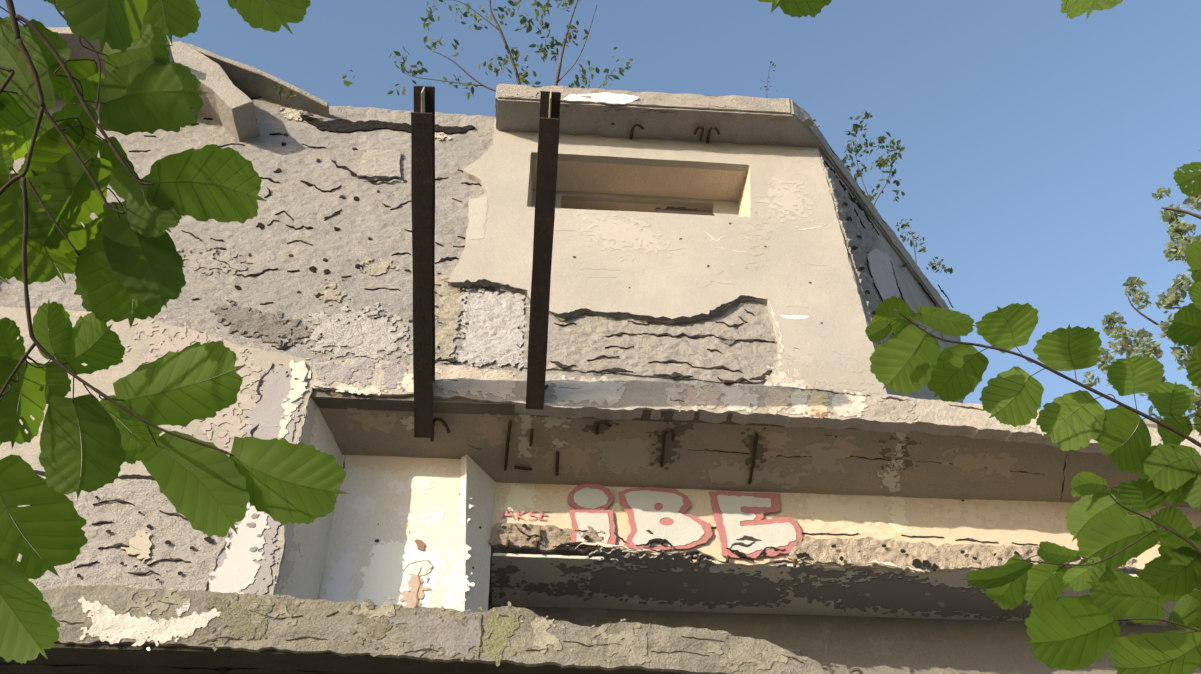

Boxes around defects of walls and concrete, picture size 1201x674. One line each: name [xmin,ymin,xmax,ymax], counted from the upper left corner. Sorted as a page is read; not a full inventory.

peeling [352,147,407,193]
spalling [466,197,488,240]
spalling [819,157,907,324]
spalling [435,271,469,365]
spalling [546,300,784,384]
corrosion [533,442,598,478]
crack [74,474,191,605]